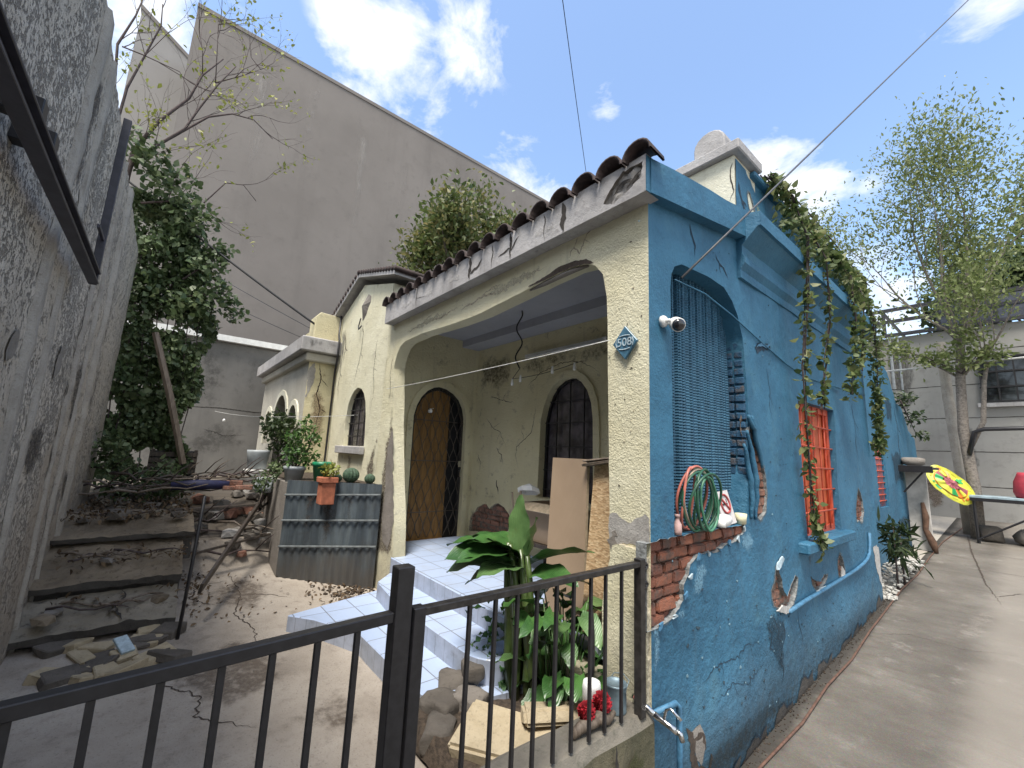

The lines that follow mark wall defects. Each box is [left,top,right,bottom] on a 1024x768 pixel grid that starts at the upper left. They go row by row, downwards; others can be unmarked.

spalling [849,478,864,523]
spalling [607,412,795,663]
crack [184,576,285,641]
spalling [734,545,884,768]
crack [165,686,256,728]